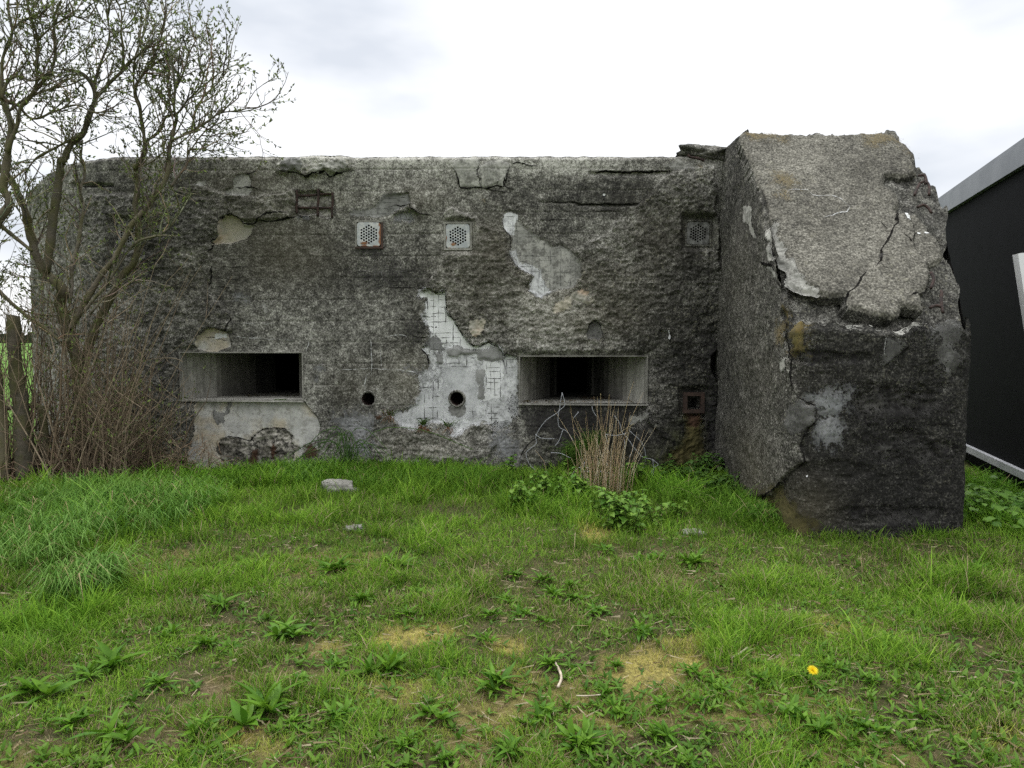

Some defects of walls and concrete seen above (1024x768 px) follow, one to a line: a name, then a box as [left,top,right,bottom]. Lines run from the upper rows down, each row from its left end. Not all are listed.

spalling [212,215,254,245]
peeling [502,211,582,299]
crack [537,200,642,221]
crack [591,168,672,176]
spalling [743,205,820,298]
crack [845,212,927,303]
spalling [195,328,231,352]
peeling [391,285,519,438]
crack [750,262,817,499]
spalling [187,401,320,468]